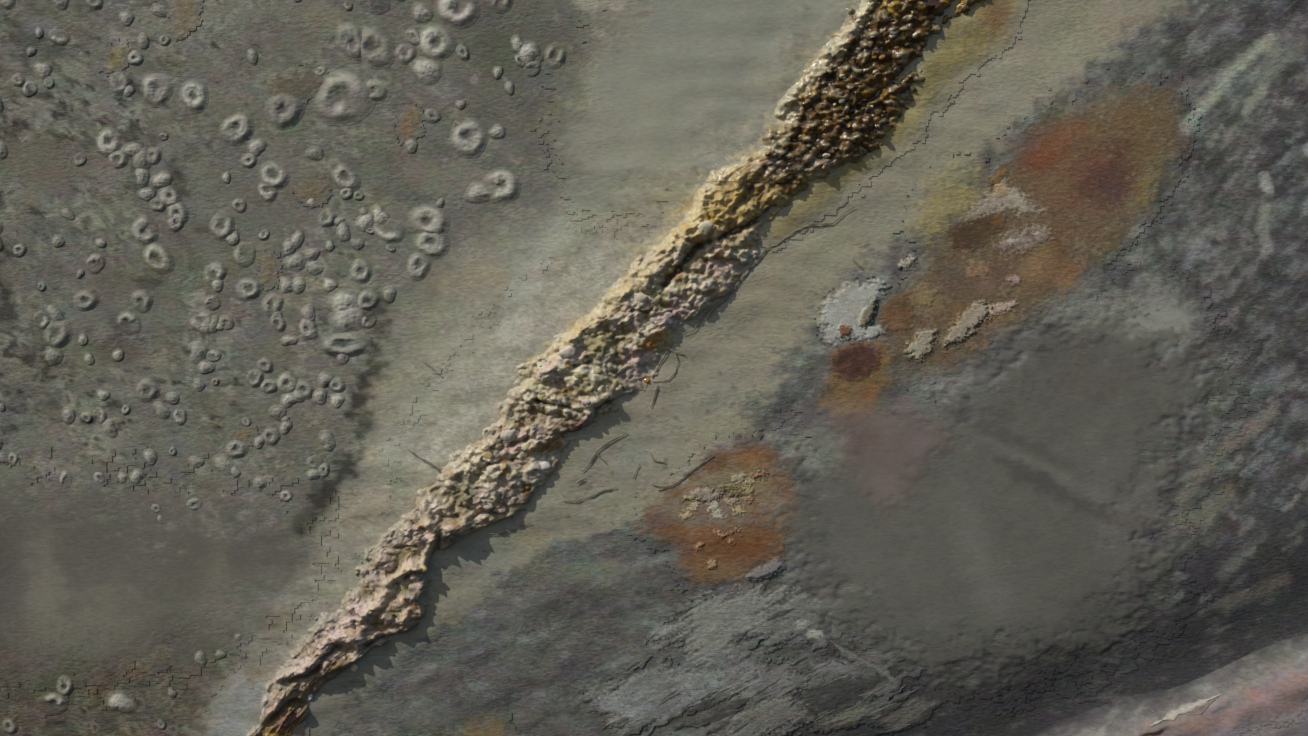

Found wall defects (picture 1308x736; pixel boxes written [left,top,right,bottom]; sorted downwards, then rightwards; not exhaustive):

crack [650,206,855,408]
rust [815,66,1202,392]
crack [407,449,442,474]
crack [562,432,715,502]
rust [627,427,805,600]